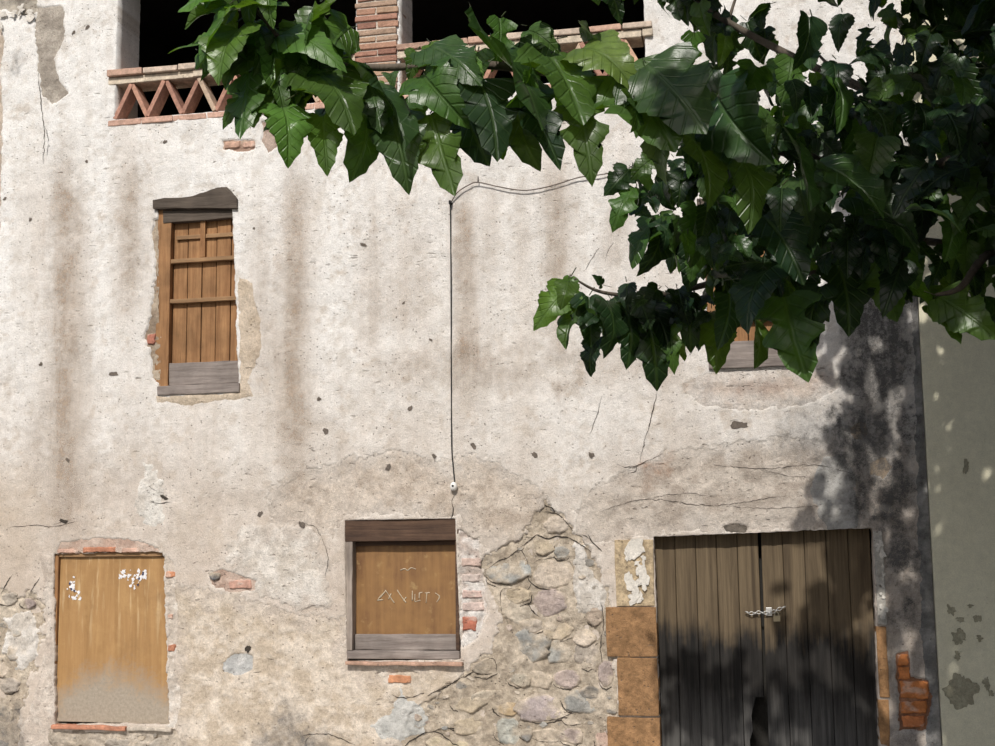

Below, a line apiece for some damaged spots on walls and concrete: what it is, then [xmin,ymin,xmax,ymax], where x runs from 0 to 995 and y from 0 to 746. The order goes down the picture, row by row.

peeling [0,0,90,104]
peeling [257,443,551,647]
crack [617,394,659,473]
peeling [572,364,841,606]
crack [606,493,815,510]
crack [719,464,849,477]
water stain [824,295,926,631]
peeling [57,538,467,746]
flaking render [895,651,994,731]
peeling [947,604,983,661]